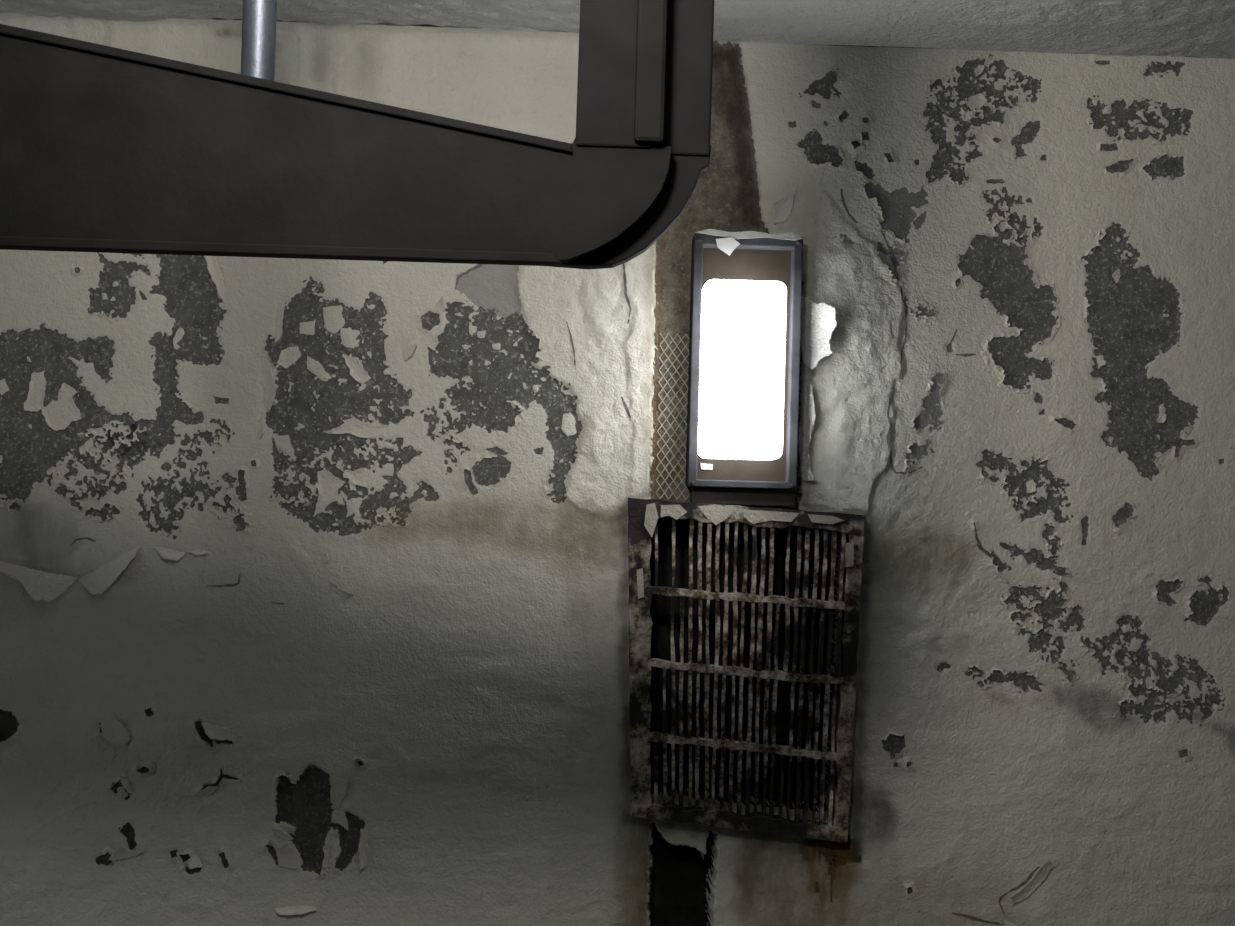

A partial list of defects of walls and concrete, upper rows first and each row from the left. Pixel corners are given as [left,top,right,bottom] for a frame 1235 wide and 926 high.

peeling [0,252,583,602]
crack [841,189,908,364]
crack [886,398,922,474]
peeling [788,52,1047,325]
peeling [903,372,948,475]
peeling [951,179,1077,435]
peeling [1078,222,1200,481]
peeling [965,449,1235,726]
spalling [260,765,369,881]
spalling [649,823,715,926]